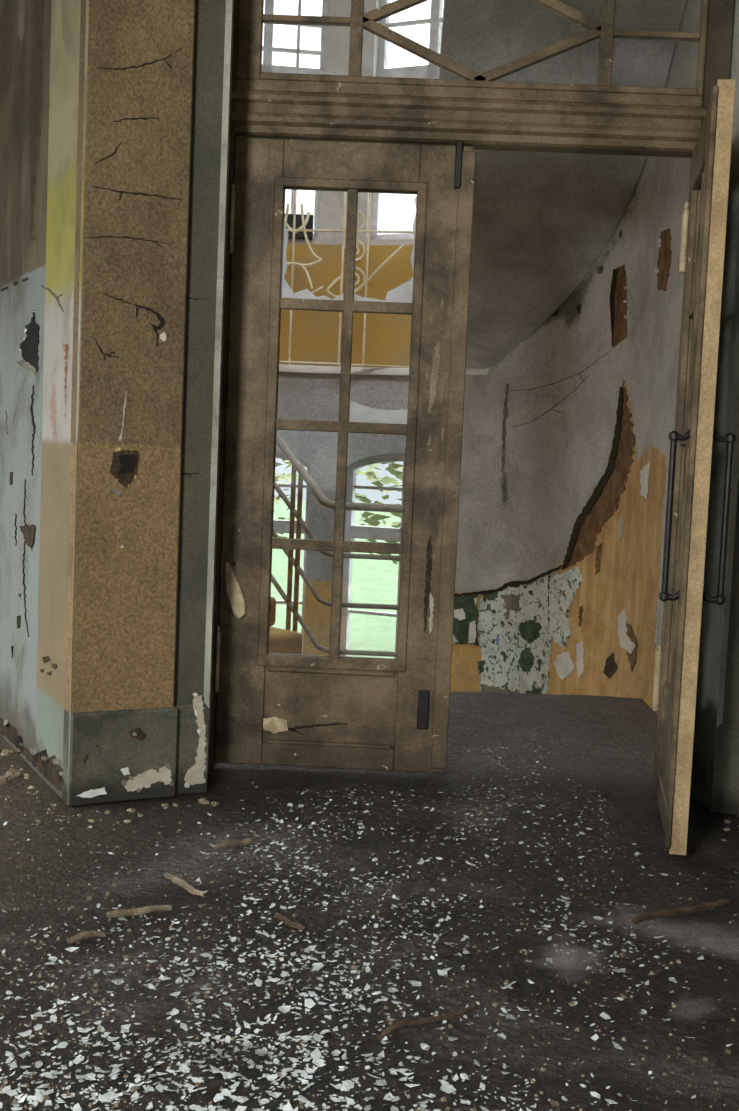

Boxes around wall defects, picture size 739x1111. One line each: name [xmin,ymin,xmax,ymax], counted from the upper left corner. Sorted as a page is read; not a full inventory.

peeling [17,310,40,375]
crack [97,291,166,347]
spalling [609,264,628,348]
spalling [110,448,139,496]
peeling [18,524,36,549]
peeling [452,381,650,716]
peeling [121,693,207,792]
peeling [0,711,703,1111]